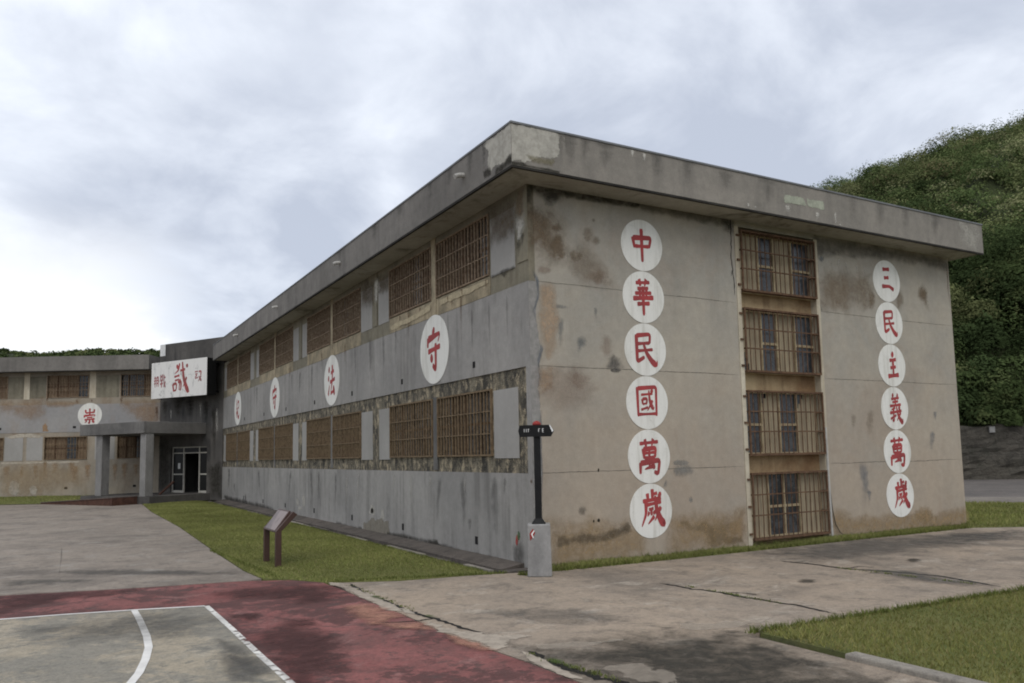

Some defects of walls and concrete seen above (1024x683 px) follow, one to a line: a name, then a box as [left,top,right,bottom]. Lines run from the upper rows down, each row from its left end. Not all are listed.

peeling [483,123,560,171]
water stain [491,185,639,258]
crack [727,220,735,293]